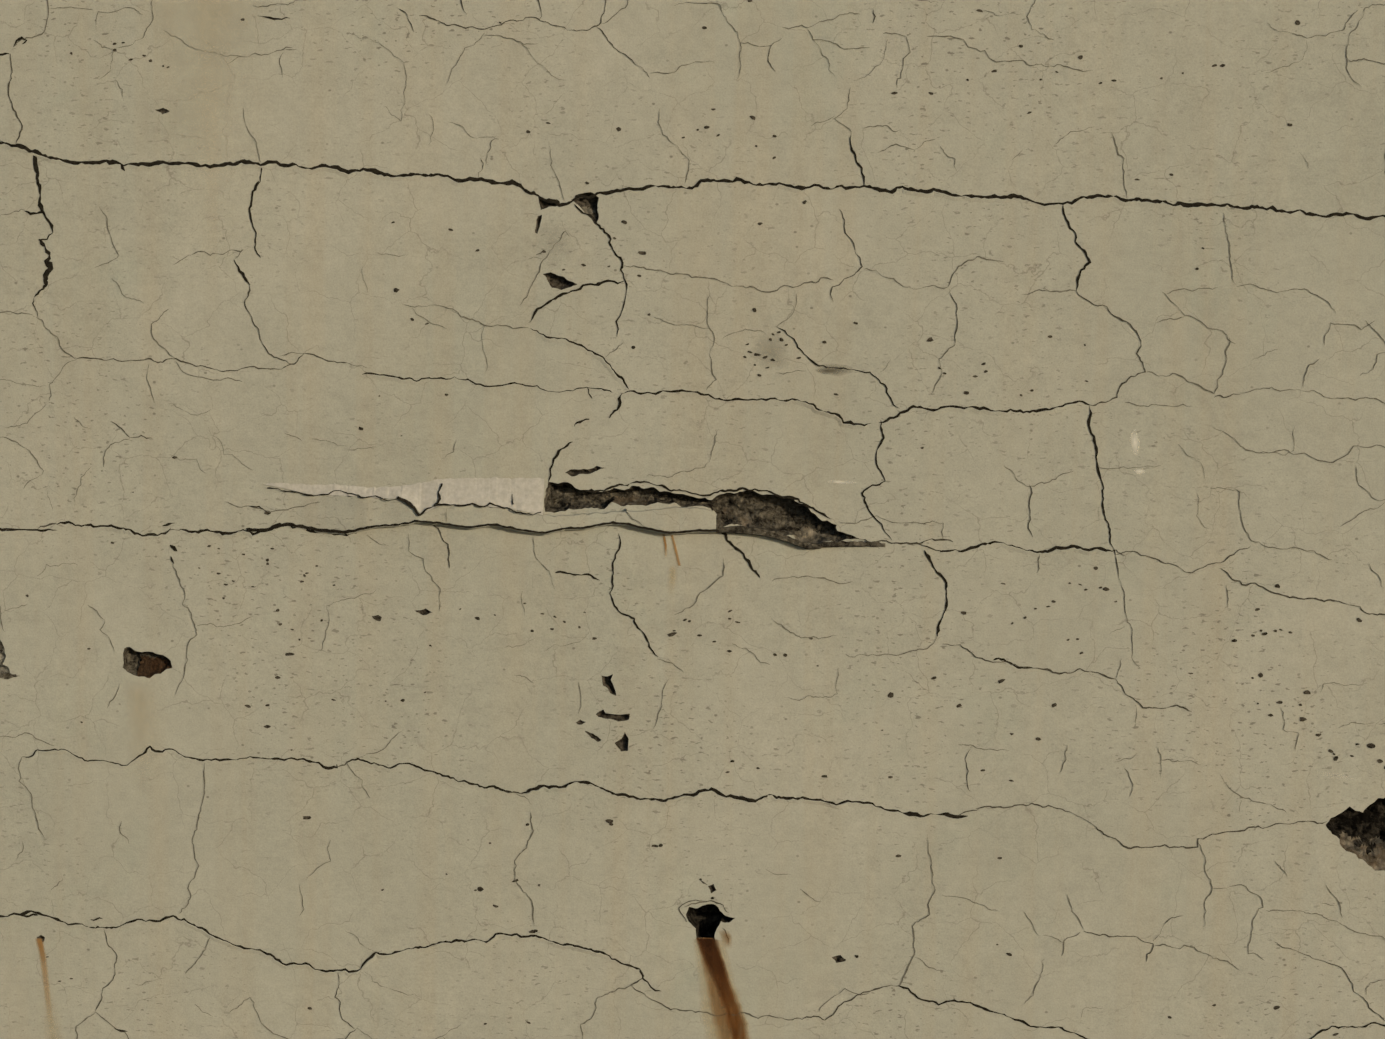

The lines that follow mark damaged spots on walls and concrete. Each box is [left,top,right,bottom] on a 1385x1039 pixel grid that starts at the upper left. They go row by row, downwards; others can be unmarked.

crack [0,0,1385,727]
spalling [265,466,856,544]
spalling [0,640,18,679]
peeling [123,647,172,678]
spalling [1316,734,1385,769]
spalling [1326,798,1385,871]
crack [0,732,1385,1039]
corrosion [698,935,746,1039]